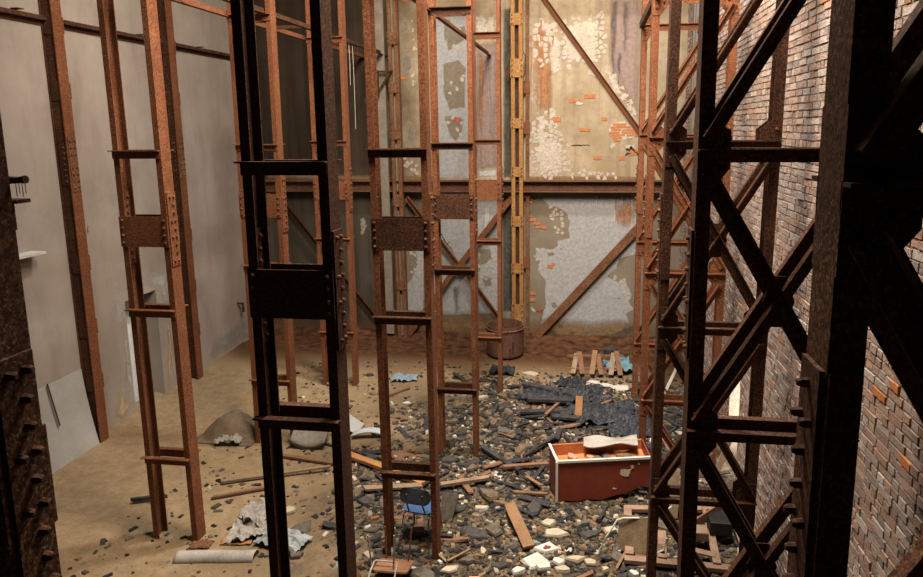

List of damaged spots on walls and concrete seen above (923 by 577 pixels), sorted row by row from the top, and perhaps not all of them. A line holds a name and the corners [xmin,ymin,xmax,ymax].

peeling [436,15,496,178]
peeling [529,10,638,180]
peeling [529,197,636,327]